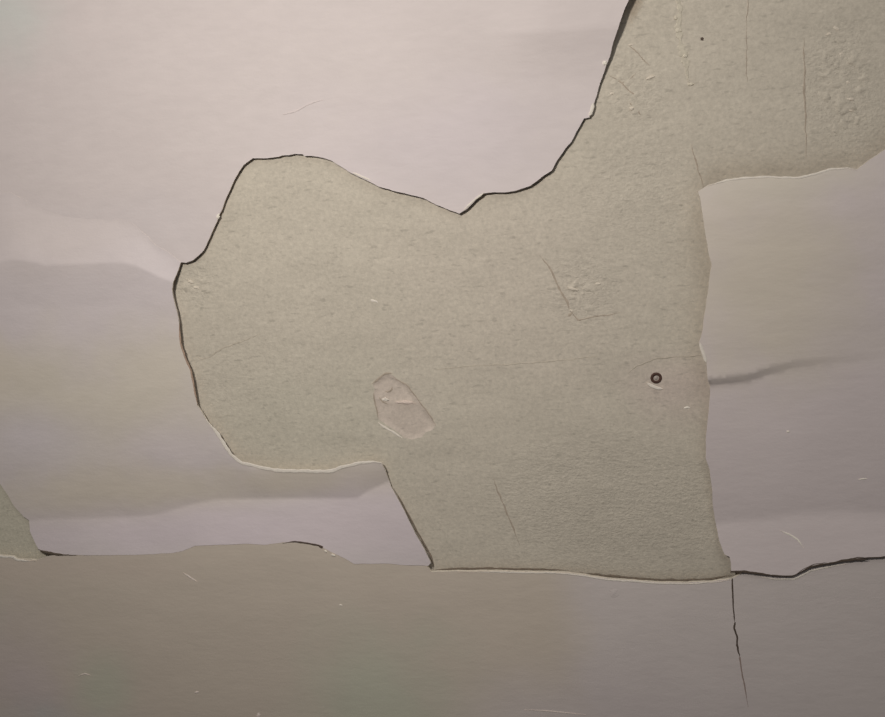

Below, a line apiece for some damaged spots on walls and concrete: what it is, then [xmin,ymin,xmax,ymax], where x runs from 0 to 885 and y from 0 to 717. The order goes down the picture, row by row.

peeling [173,0,885,585]
peeling [0,485,50,562]
crack [730,556,885,704]